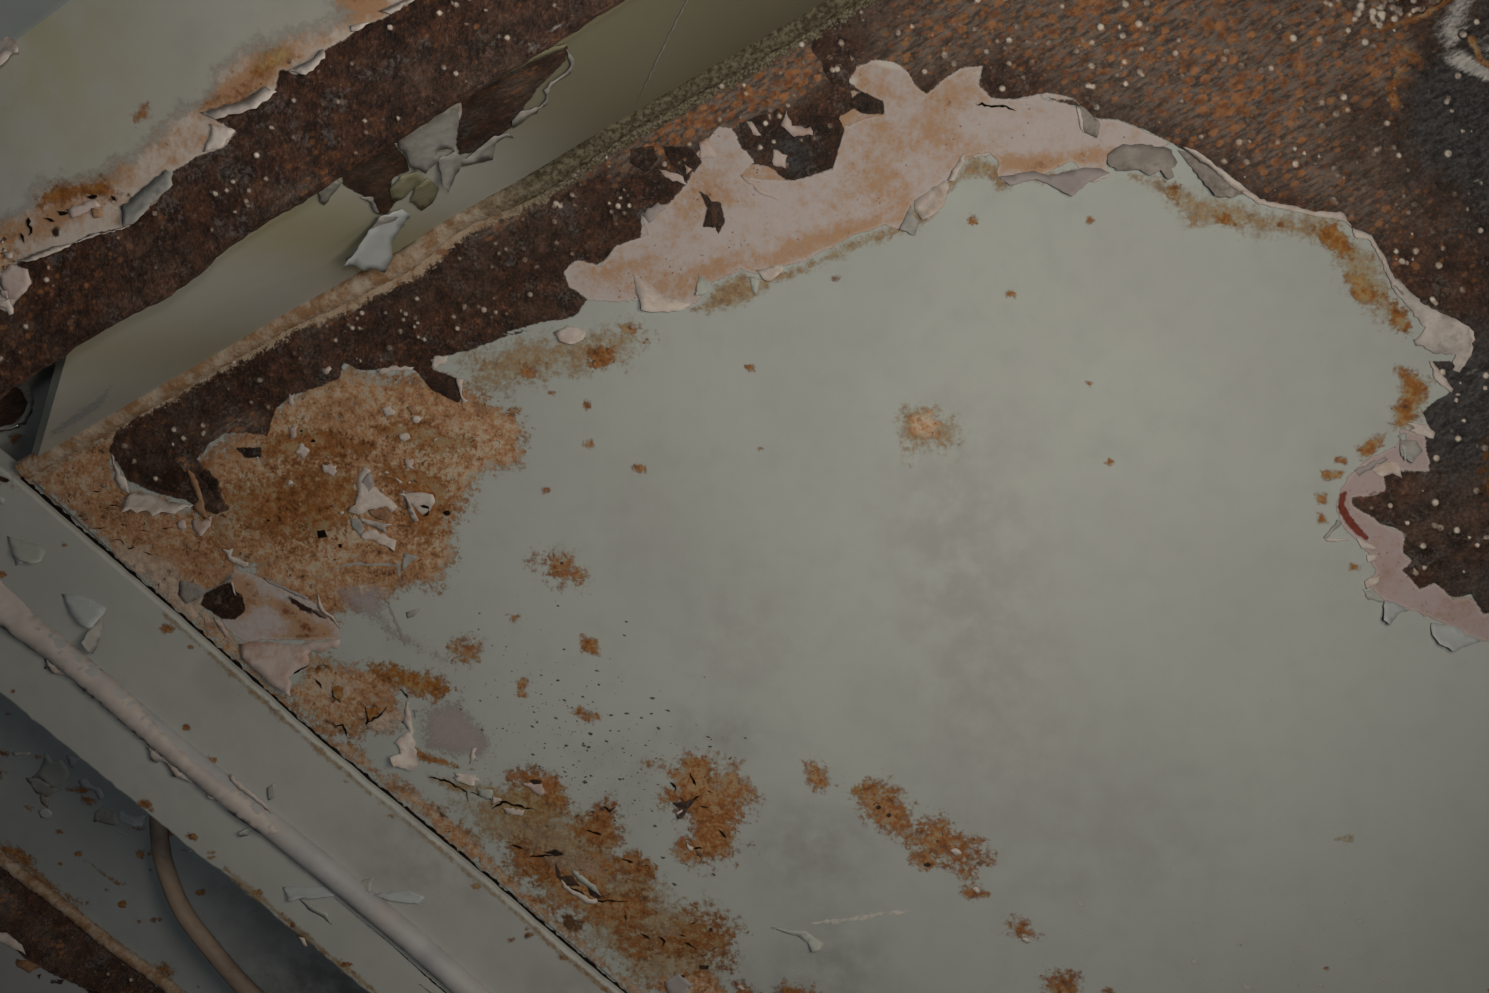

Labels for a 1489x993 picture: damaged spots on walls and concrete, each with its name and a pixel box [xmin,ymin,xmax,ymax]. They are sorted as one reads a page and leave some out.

peeling [0,0,414,316]
corrosion [0,0,637,444]
corrosion [700,192,725,234]
peeling [564,59,1475,393]
corrosion [1154,181,1411,332]
peeling [554,325,586,344]
corrosion [1391,366,1428,428]
peeling [1324,423,1489,651]
peeling [0,580,280,837]
corrosion [647,751,760,870]
corrosion [851,777,997,899]
corrosion [591,874,735,993]